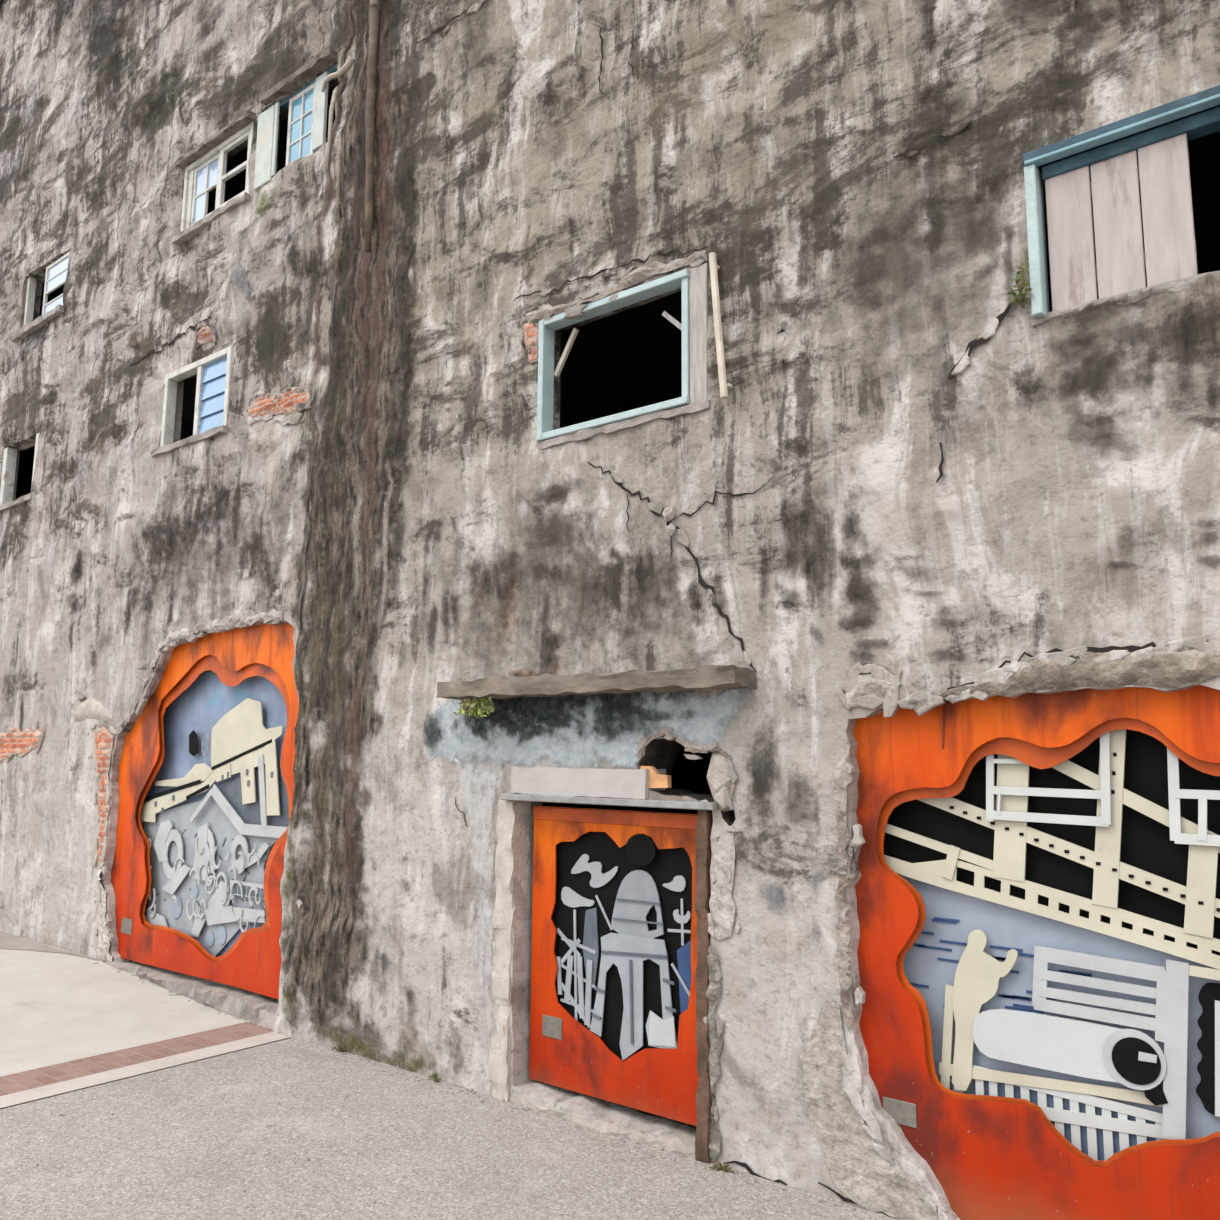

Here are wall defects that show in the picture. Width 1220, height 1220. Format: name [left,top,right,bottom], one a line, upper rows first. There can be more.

crack [416,0,489,44]
spalling [520,250,707,364]
crack [947,300,1016,380]
leakage [1051,299,1217,397]
leakage [132,488,269,623]
leakage [269,0,419,1047]
leakage [409,587,463,645]
crack [587,462,774,671]
crack [936,442,944,483]
flaking render [92,727,118,963]
peeling [423,688,748,1048]
spalling [703,826,741,1162]